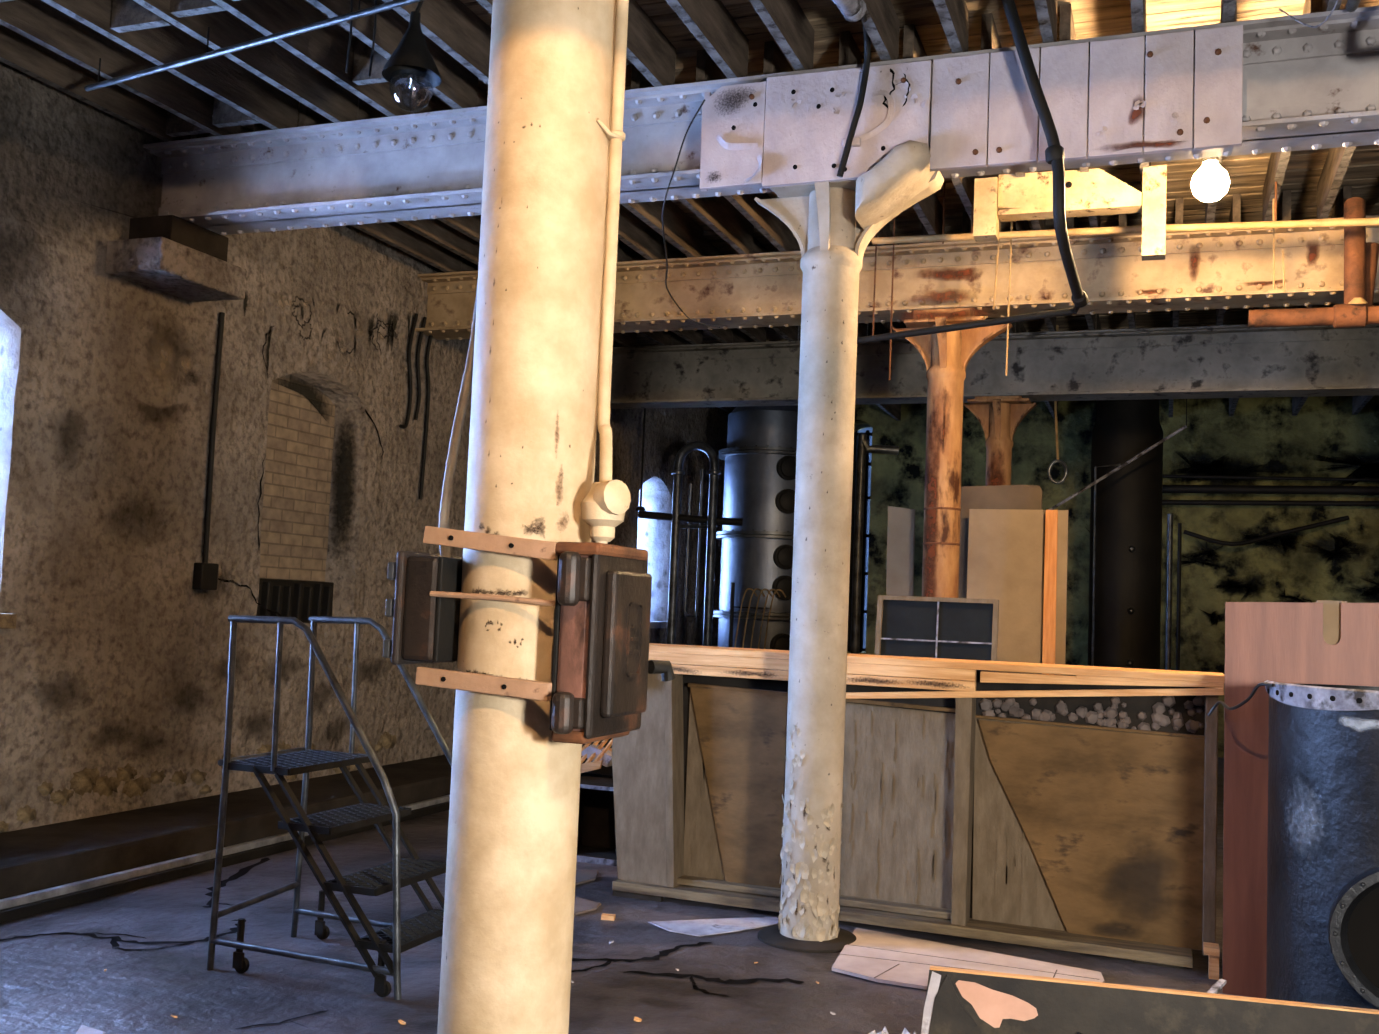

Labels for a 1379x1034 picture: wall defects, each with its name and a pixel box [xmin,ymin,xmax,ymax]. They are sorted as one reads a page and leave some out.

rust [1129,99,1143,123]
rust [1114,141,1177,150]
rust [1190,251,1199,277]
rust [1307,243,1318,264]
rust [911,268,977,320]
rust [990,458,1004,486]
rust [924,409,945,597]
peeling [778,724,844,942]
crack [571,942,804,997]